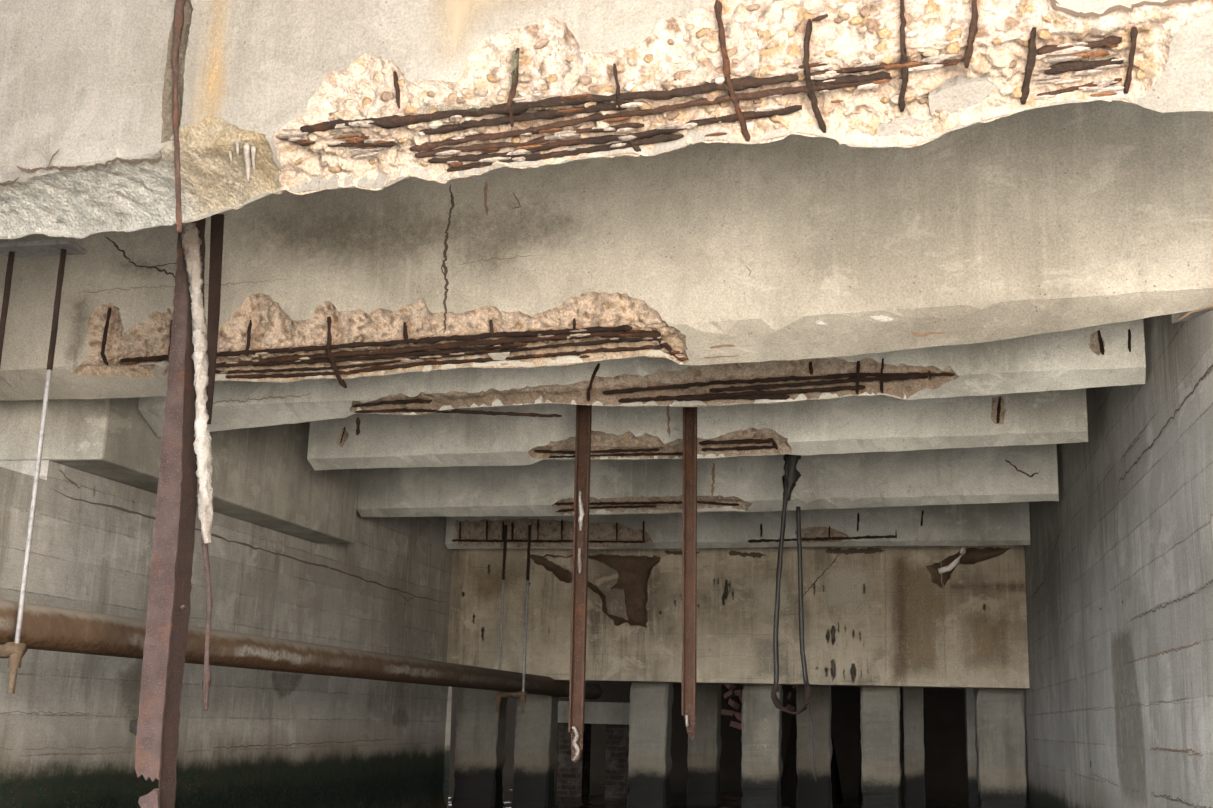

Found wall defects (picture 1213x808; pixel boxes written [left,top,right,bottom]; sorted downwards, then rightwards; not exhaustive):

spalling [0,0,1213,239]
crack [75,236,176,293]
crack [441,182,534,337]
spalling [68,302,173,387]
damp [181,222,214,544]
spalling [528,437,576,460]
spalling [205,291,959,435]
spalling [591,428,793,460]
crack [1117,364,1213,532]
spalling [452,498,574,583]
spalling [588,495,682,628]
spalling [926,547,1010,588]